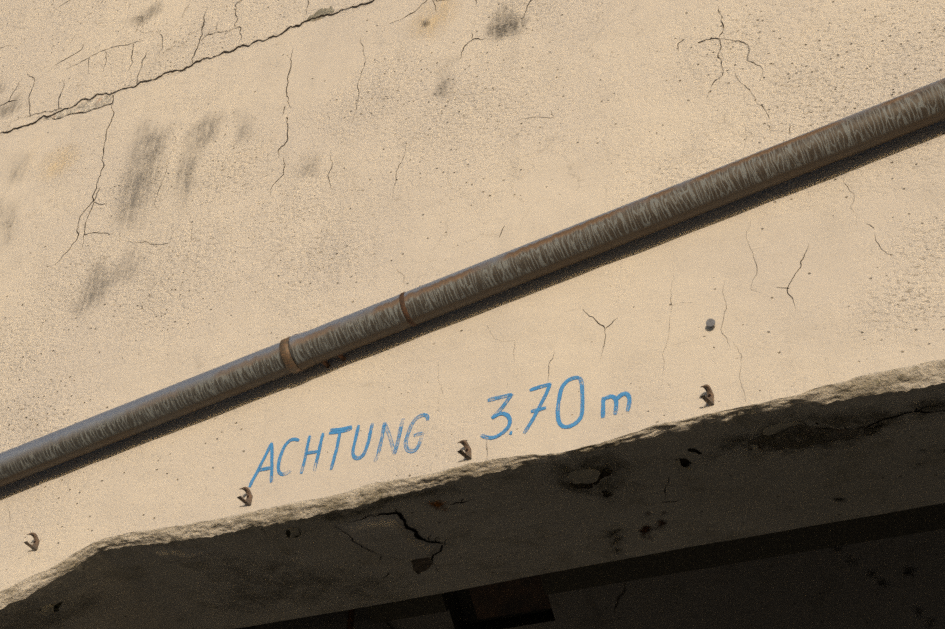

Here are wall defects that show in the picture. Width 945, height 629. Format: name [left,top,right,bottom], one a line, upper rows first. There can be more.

crack [0,0,374,262]
crack [677,9,790,133]
crack [335,508,457,580]
spalling [566,469,613,498]